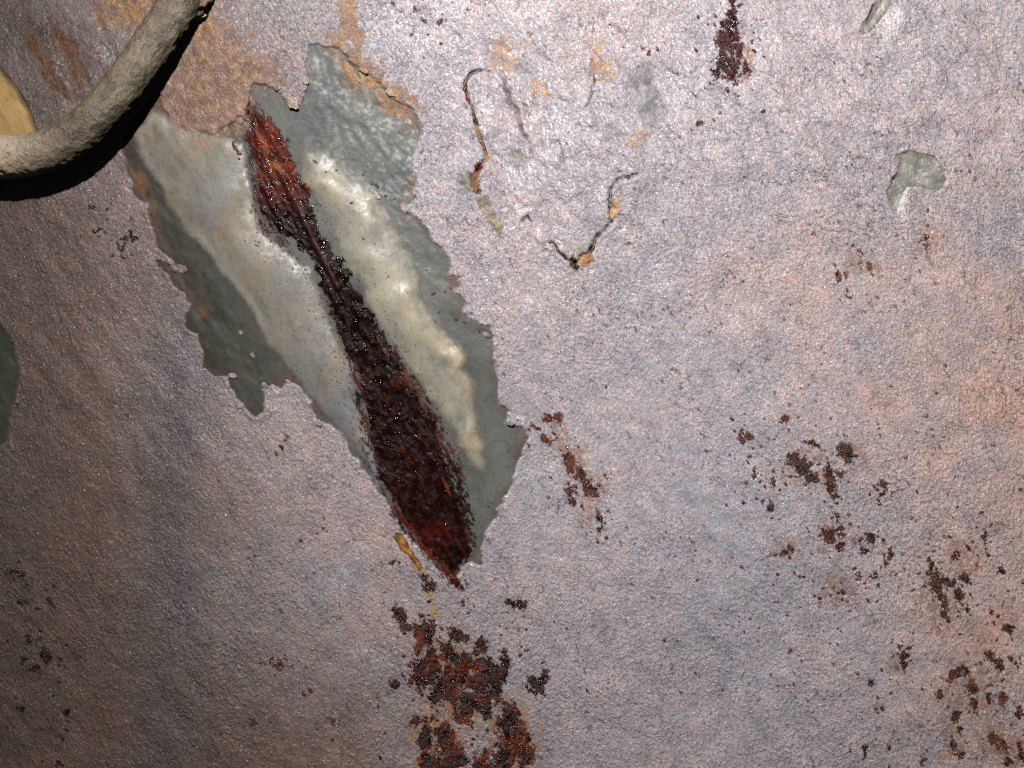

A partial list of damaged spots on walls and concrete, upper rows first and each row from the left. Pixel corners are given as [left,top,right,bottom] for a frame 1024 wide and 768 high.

crack [457,68,631,270]
rust [690,0,765,138]
spalling [886,151,946,214]
peeling [123,45,529,578]
rust [150,0,551,768]
rust [517,409,644,544]
rust [704,400,1024,768]